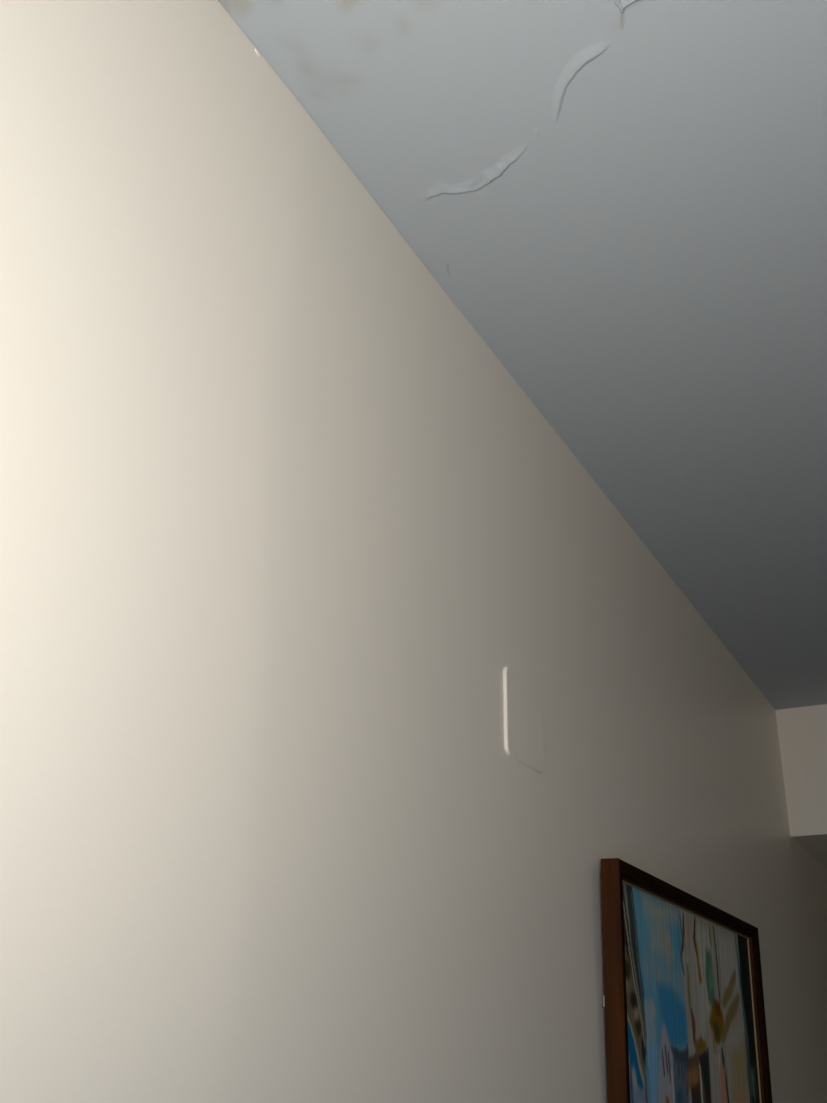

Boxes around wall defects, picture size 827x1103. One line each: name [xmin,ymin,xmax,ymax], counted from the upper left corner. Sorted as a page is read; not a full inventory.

water stain [218,0,263,27]